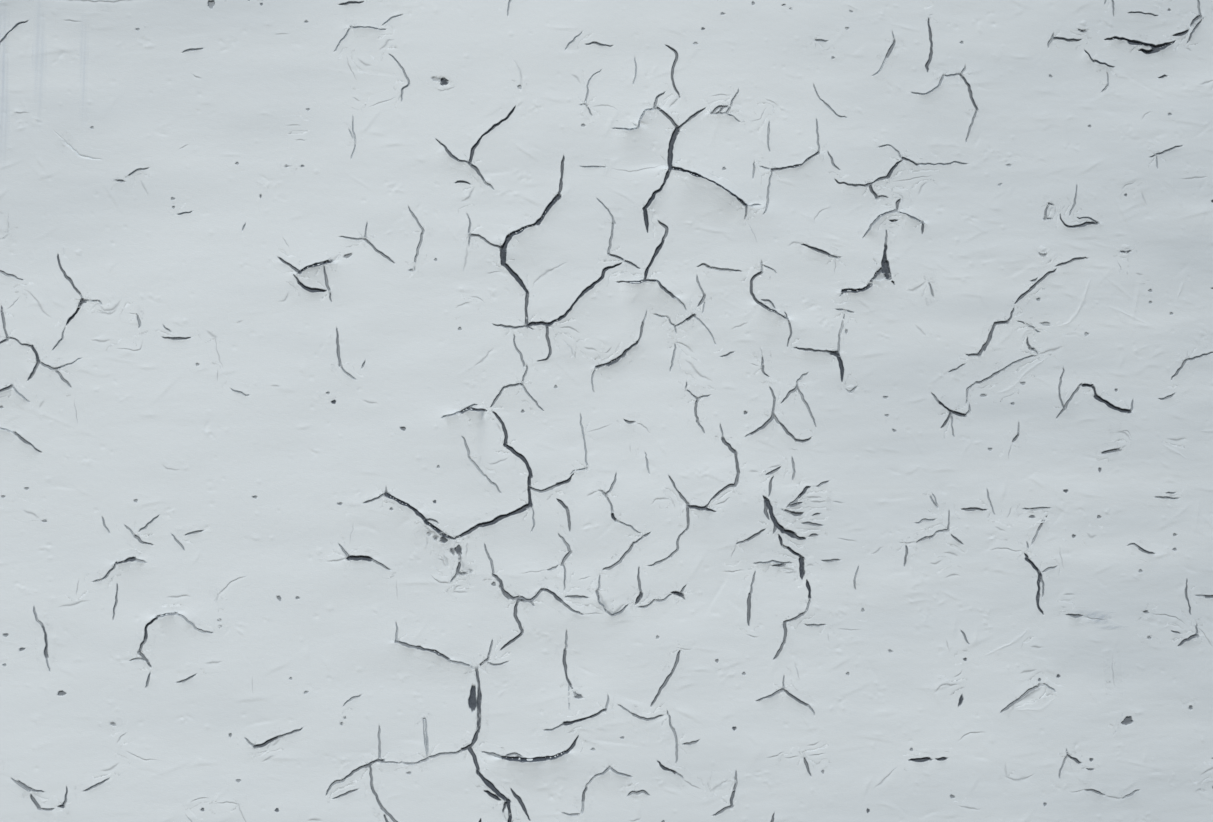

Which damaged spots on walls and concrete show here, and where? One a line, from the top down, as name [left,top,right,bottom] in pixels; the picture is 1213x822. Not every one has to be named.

crack [491,0,526,22]
crack [1039,0,1182,103]
peeling [701,81,749,133]
crack [1142,136,1190,175]
peeling [267,244,367,311]
crack [0,247,150,464]
crack [921,178,1213,467]
crack [315,5,1063,822]
crack [85,504,220,698]
crack [236,716,313,759]
crack [0,766,77,820]